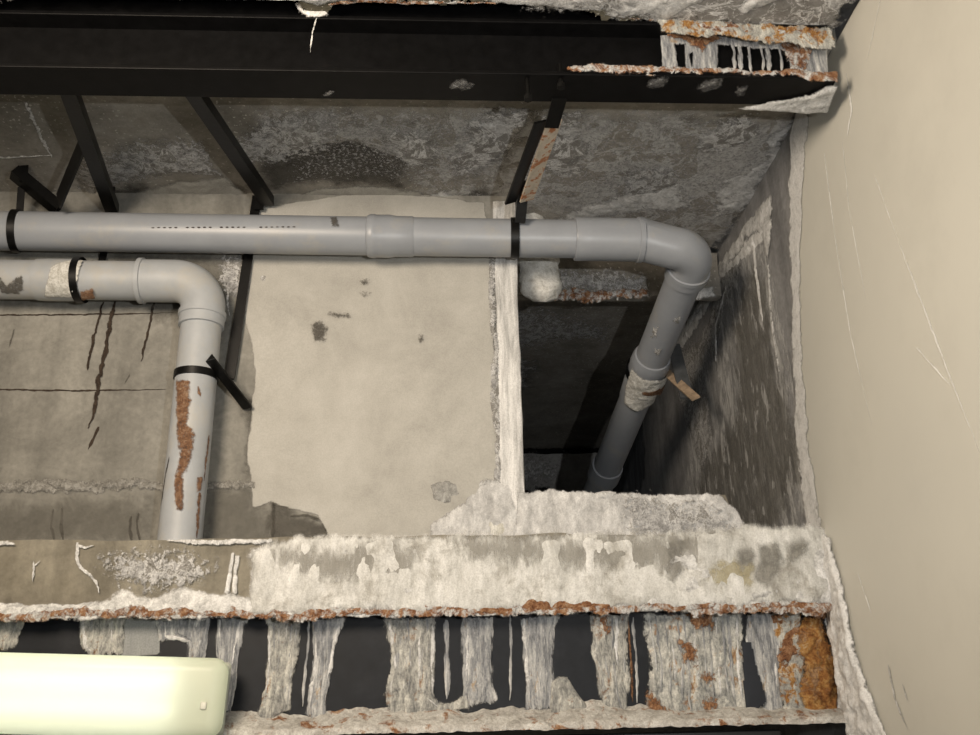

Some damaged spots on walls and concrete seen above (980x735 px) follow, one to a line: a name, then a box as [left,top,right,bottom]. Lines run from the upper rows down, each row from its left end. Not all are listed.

rust [667,34,722,50]
rust [554,287,649,304]
leakage [0,86,886,735]
rust [160,380,201,510]
rust [196,436,210,538]
rust [596,614,611,636]
rust [685,611,715,631]
peeling [742,642,766,709]
peeling [771,612,826,709]